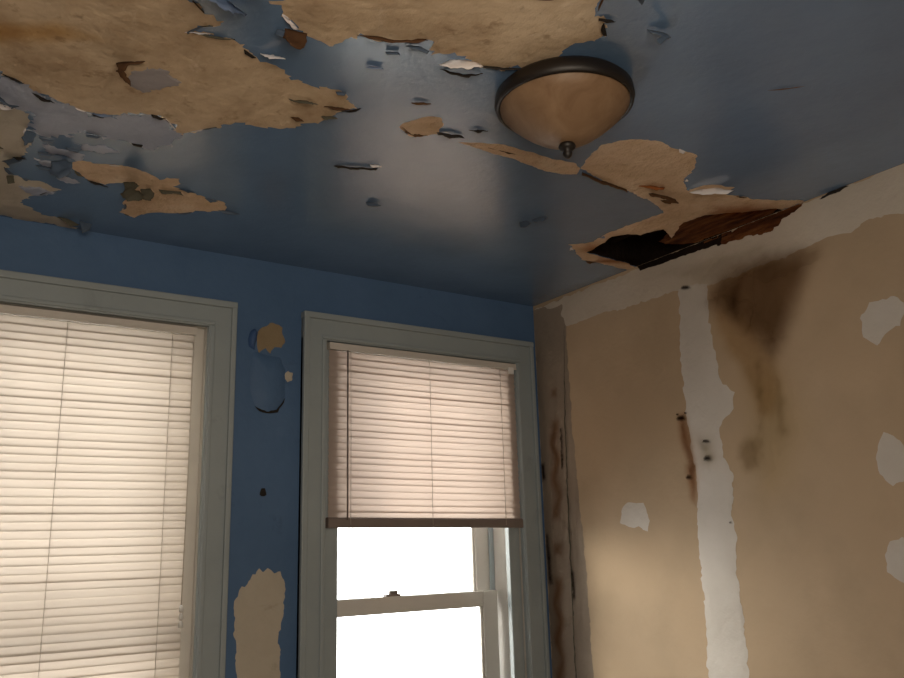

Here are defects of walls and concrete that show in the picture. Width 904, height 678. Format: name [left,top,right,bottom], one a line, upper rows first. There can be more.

peeling [269,0,615,78]
peeling [0,0,361,233]
peeling [400,117,804,270]
peeling [248,323,285,353]
peeling [233,568,286,678]